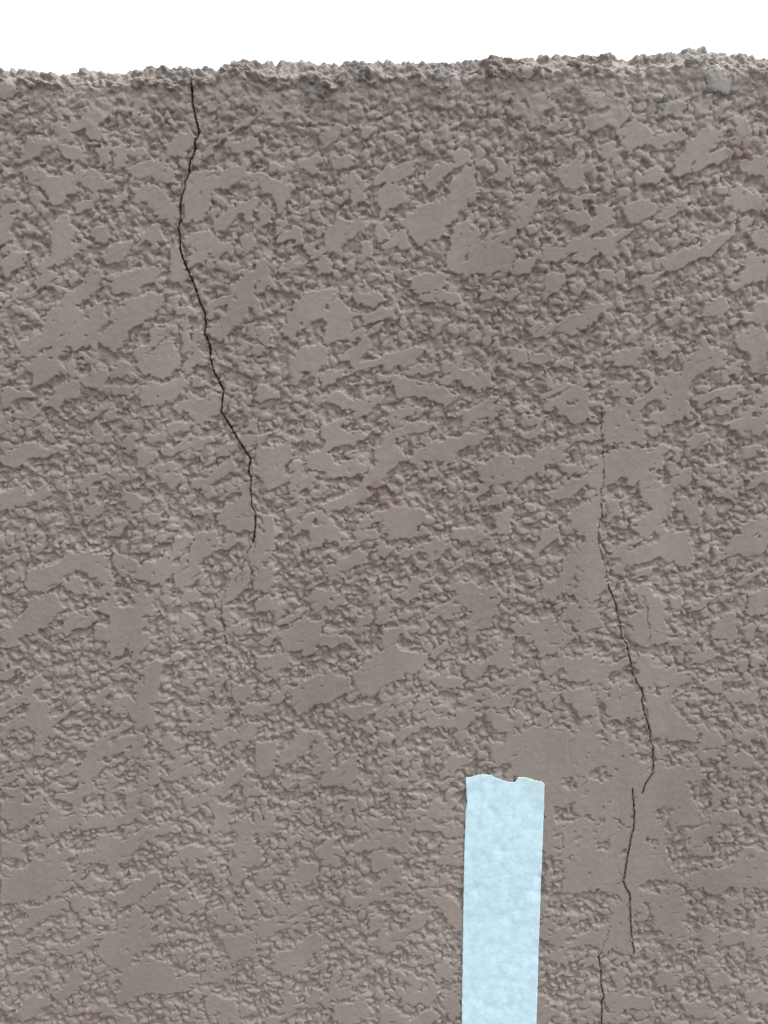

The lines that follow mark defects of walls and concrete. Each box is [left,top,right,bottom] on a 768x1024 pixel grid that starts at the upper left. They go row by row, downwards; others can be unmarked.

crack [178,80,256,570]
crack [598,408,656,1024]